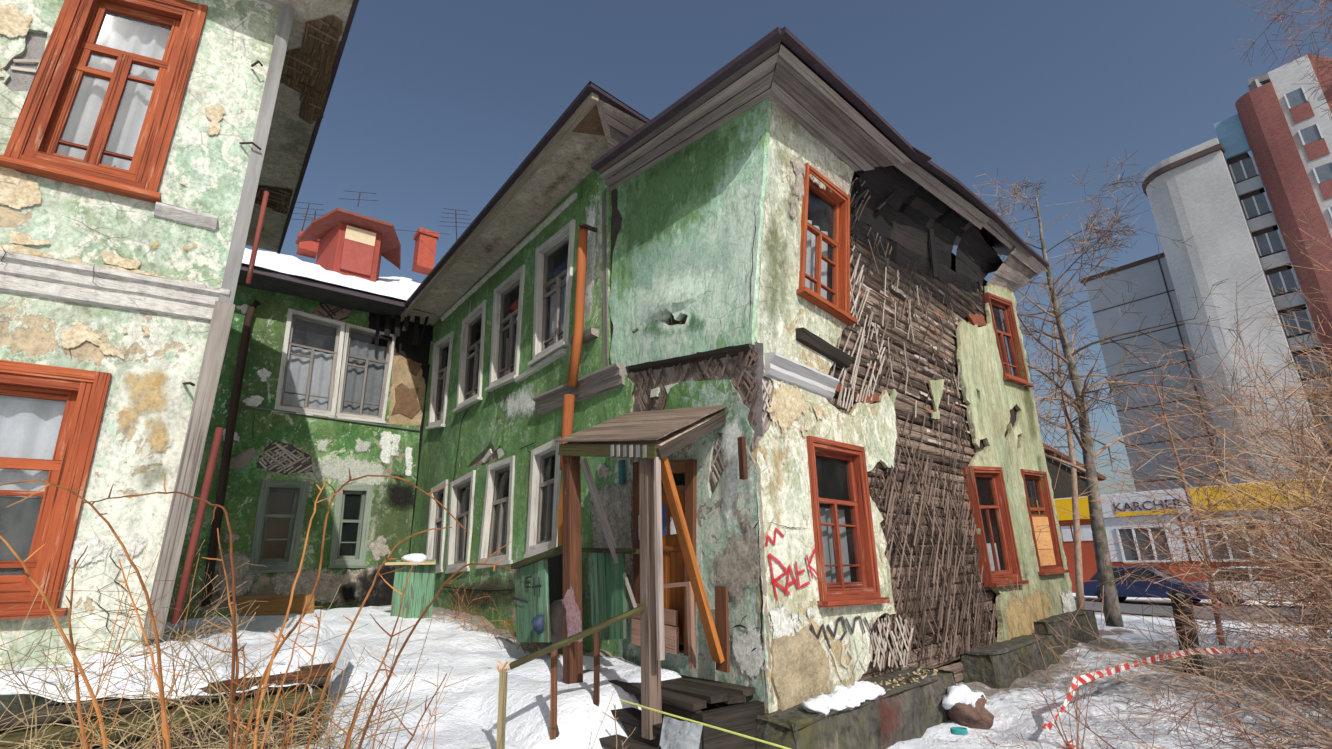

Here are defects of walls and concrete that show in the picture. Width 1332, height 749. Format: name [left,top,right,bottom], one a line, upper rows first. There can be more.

flaking render [0,3,47,91]
flaking render [280,15,343,124]
peeling [0,166,42,209]
spalling [0,231,195,283]
peeling [60,321,124,359]
flaking render [387,340,425,425]
peeling [223,429,388,486]
flaking render [628,215,998,683]
spalling [1005,407,1018,448]
spalling [729,605,830,711]